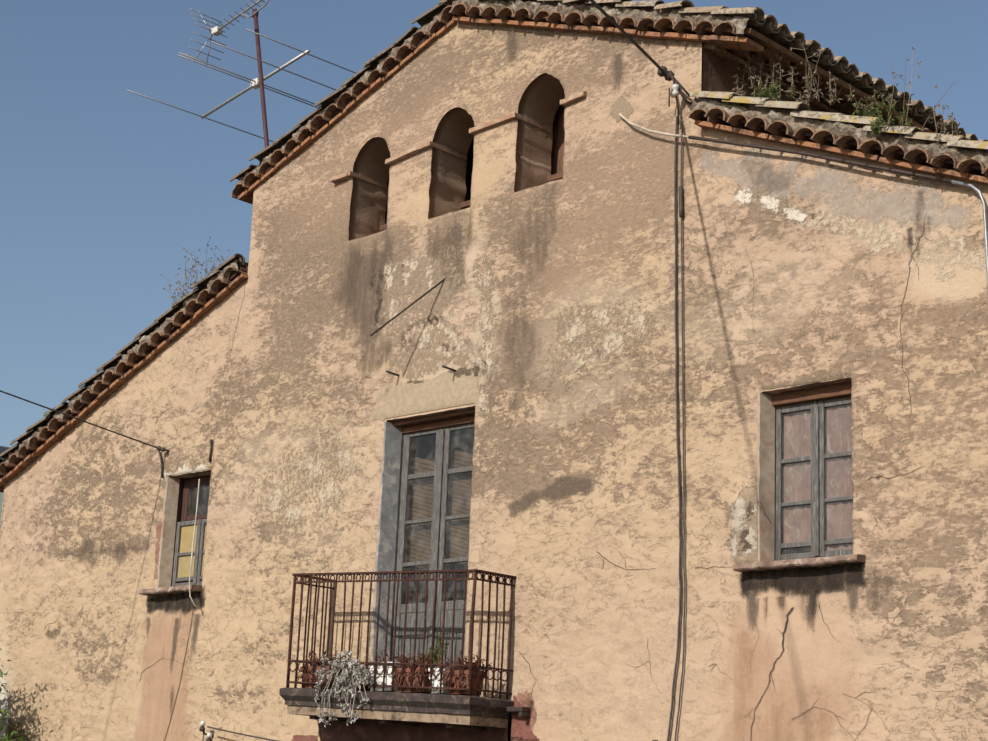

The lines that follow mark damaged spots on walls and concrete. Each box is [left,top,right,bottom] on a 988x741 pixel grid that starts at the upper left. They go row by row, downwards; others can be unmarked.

peeling [731,186,808,225]
leakage [339,239,392,370]
crack [900,213,932,422]
leakage [747,591,757,625]
leakage [806,588,817,621]
leakage [849,585,858,609]
crack [708,607,794,741]
flaking render [510,690,538,741]
crack [792,692,890,741]